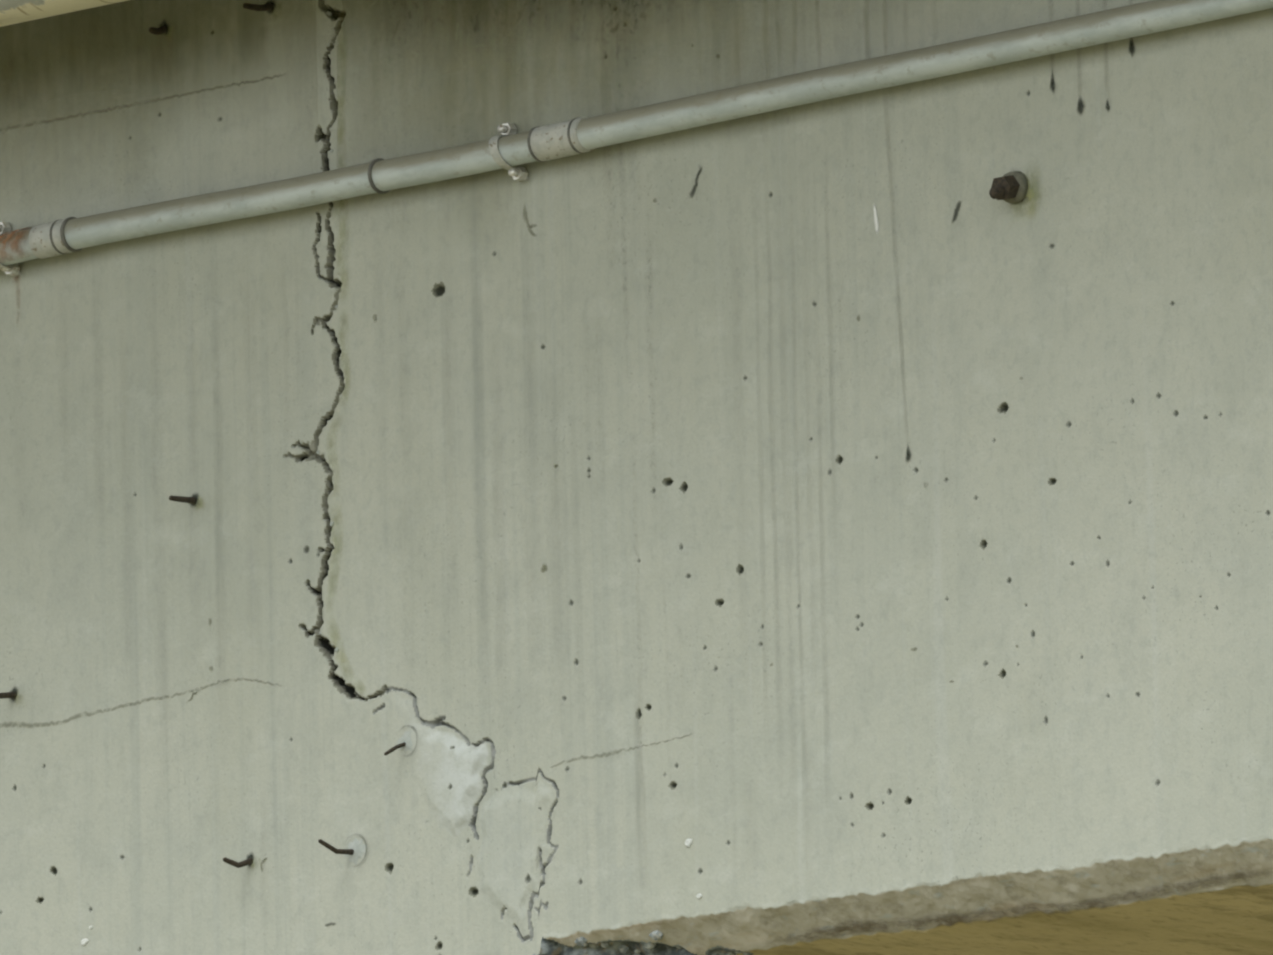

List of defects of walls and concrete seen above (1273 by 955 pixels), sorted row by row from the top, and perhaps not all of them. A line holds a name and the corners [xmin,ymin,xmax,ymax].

crack [315,0,346,172]
crack [285,202,559,943]
spalling [533,930,755,955]